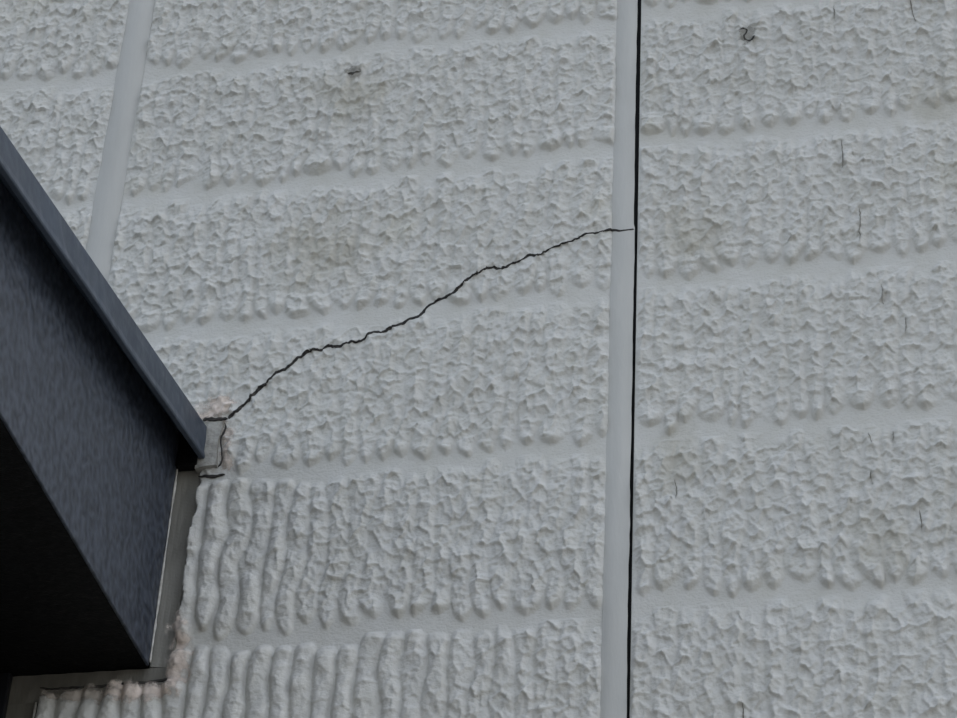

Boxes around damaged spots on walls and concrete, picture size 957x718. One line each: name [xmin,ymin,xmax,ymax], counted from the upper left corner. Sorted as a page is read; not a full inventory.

crack [198,228,634,478]